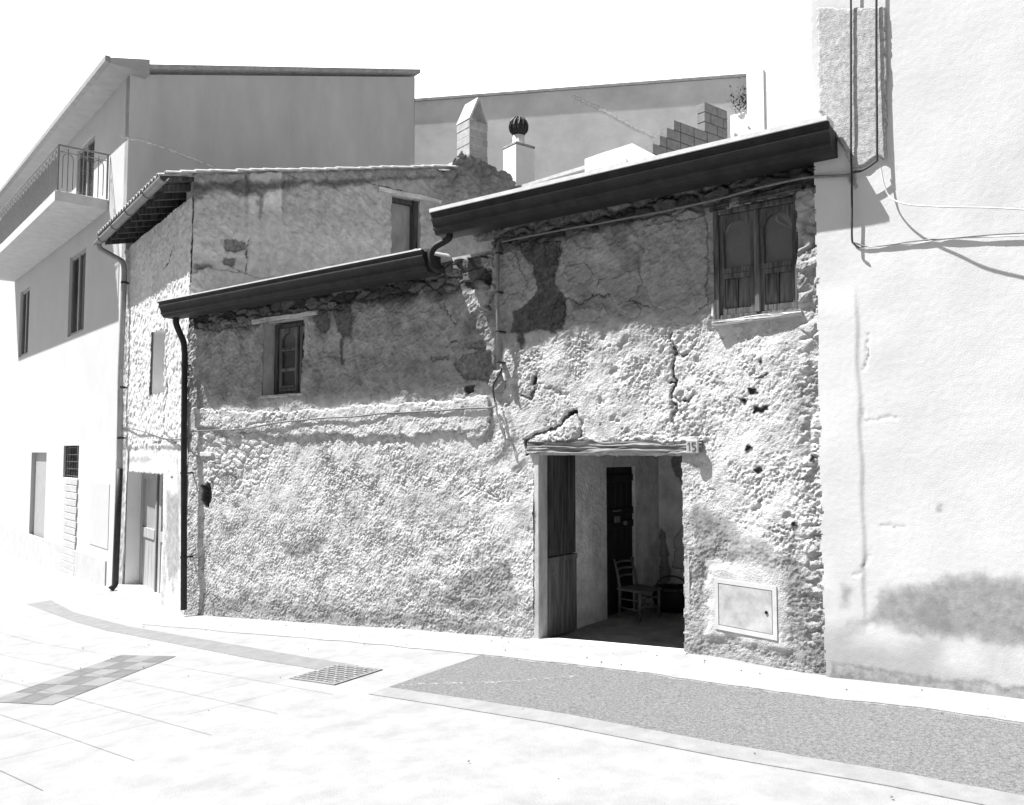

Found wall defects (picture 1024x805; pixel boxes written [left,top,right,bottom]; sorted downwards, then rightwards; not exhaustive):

spalling [223,239,246,267]
spalling [474,179,746,319]
spalling [431,340,496,394]
crack [670,334,692,424]
crack [526,388,584,438]
damp [874,577,1024,642]